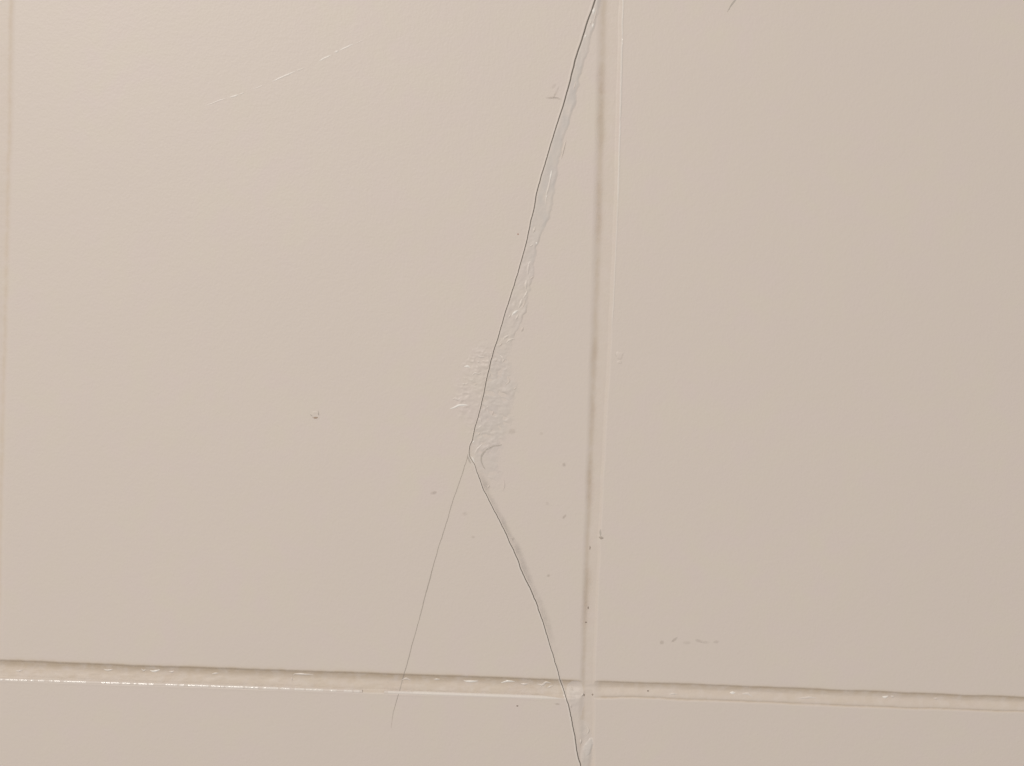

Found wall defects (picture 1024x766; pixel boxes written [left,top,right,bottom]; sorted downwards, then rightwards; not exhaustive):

crack [391,0,596,766]